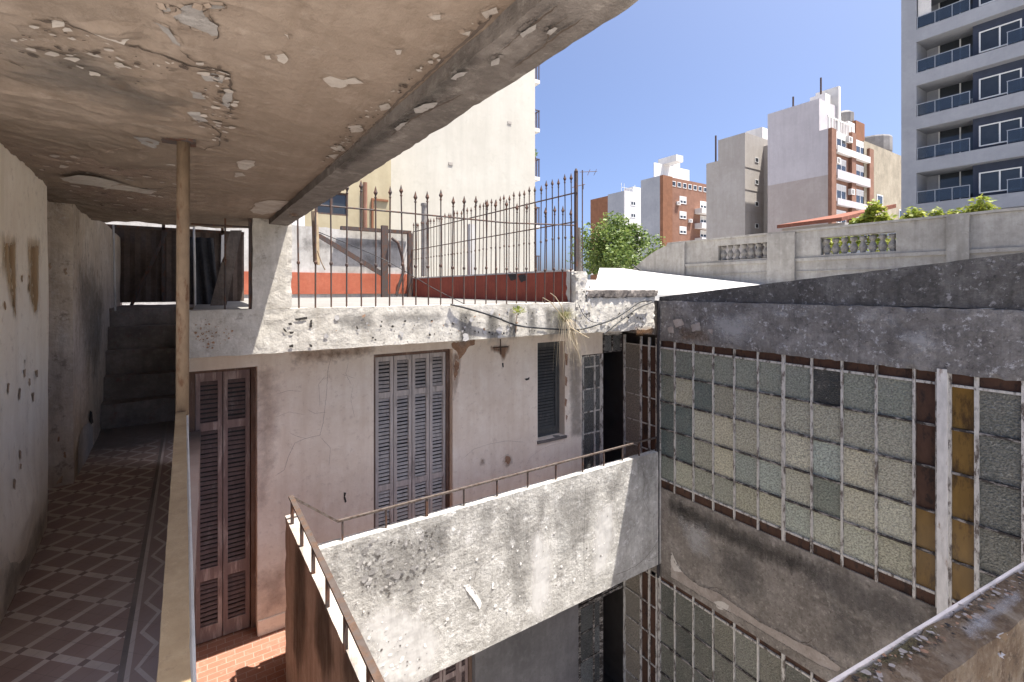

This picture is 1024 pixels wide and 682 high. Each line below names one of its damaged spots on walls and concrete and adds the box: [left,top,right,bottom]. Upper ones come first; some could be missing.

spalling [153,1,227,47]
peeling [458,4,502,37]
flaking render [517,20,558,37]
spalling [11,17,239,143]
peeling [319,54,441,162]
water stain [4,242,16,303]
spalling [354,308,538,381]